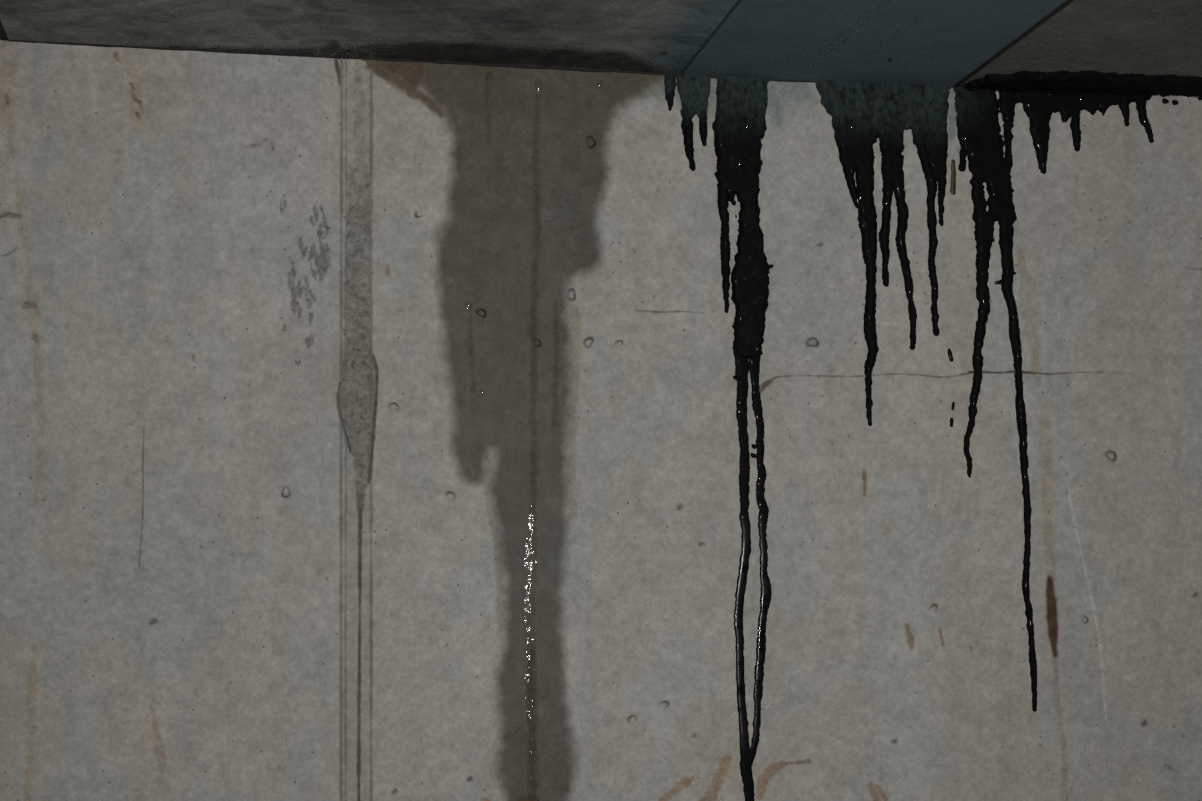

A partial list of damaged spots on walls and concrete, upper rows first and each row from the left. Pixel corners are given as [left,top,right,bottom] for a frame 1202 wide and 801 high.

water stain [707,78,717,120]
water stain [767,81,812,127]
water stain [947,87,957,140]
water stain [167,41,681,801]
corrosion [1040,411,1058,679]
corrosion [701,755,731,801]
corrosion [757,759,811,799]